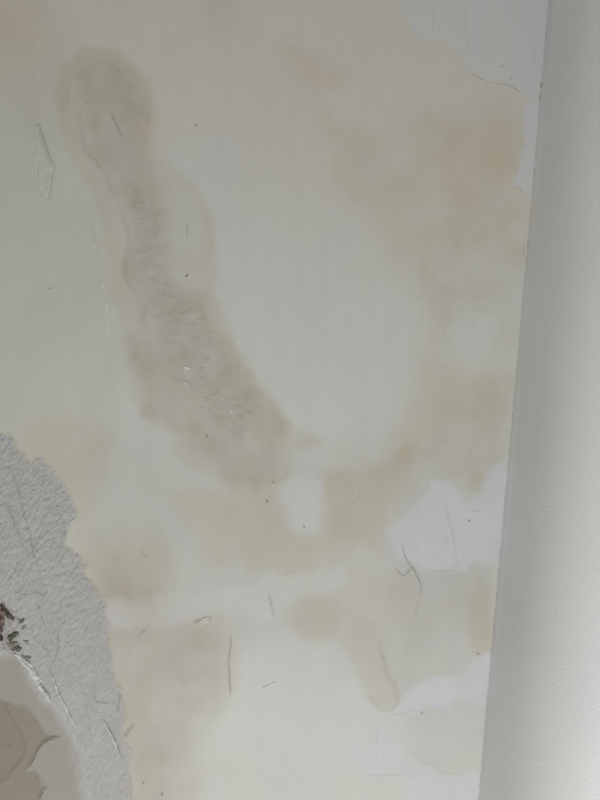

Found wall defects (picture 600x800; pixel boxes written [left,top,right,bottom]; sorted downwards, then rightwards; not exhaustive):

peeling [397,0,548,203]
damp [0,0,530,719]
flaking render [0,433,133,800]
damp [109,616,245,800]